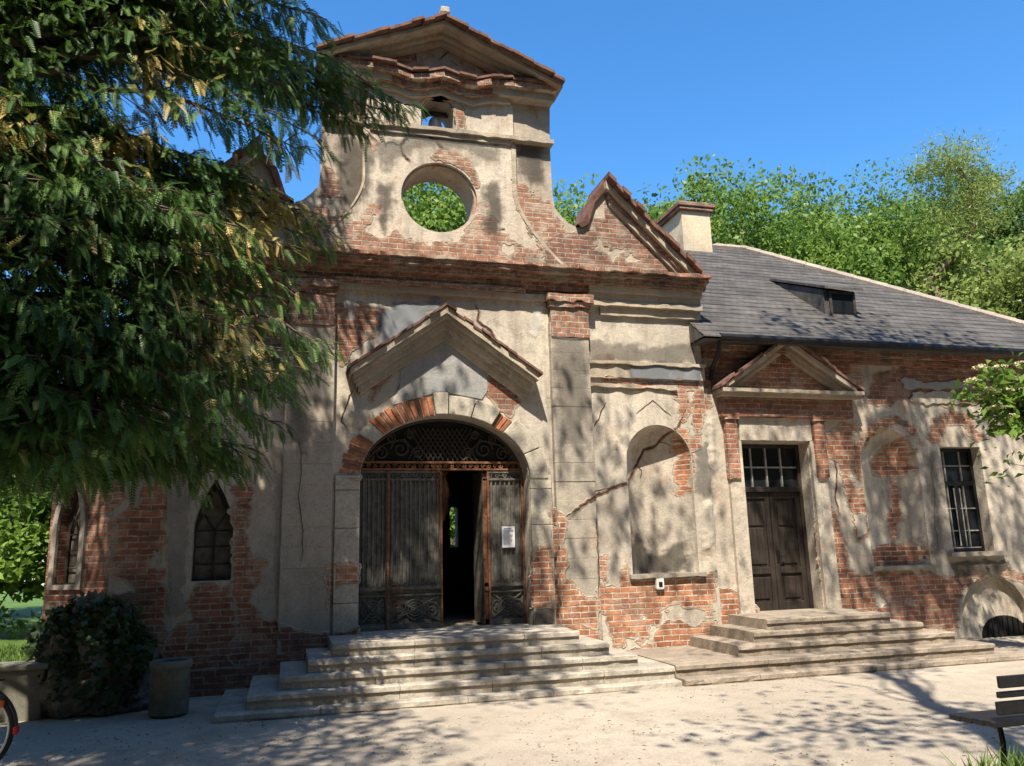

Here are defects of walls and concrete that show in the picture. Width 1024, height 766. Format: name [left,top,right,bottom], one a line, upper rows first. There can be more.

spalling [430,148,481,189]
spalling [294,160,672,272]
spalling [104,472,362,669]
crack [297,440,305,561]
spalling [485,374,522,419]
crack [567,399,689,600]
spalling [528,507,739,650]
spalling [589,353,744,497]
crack [833,459,841,516]
spalling [825,364,1024,632]